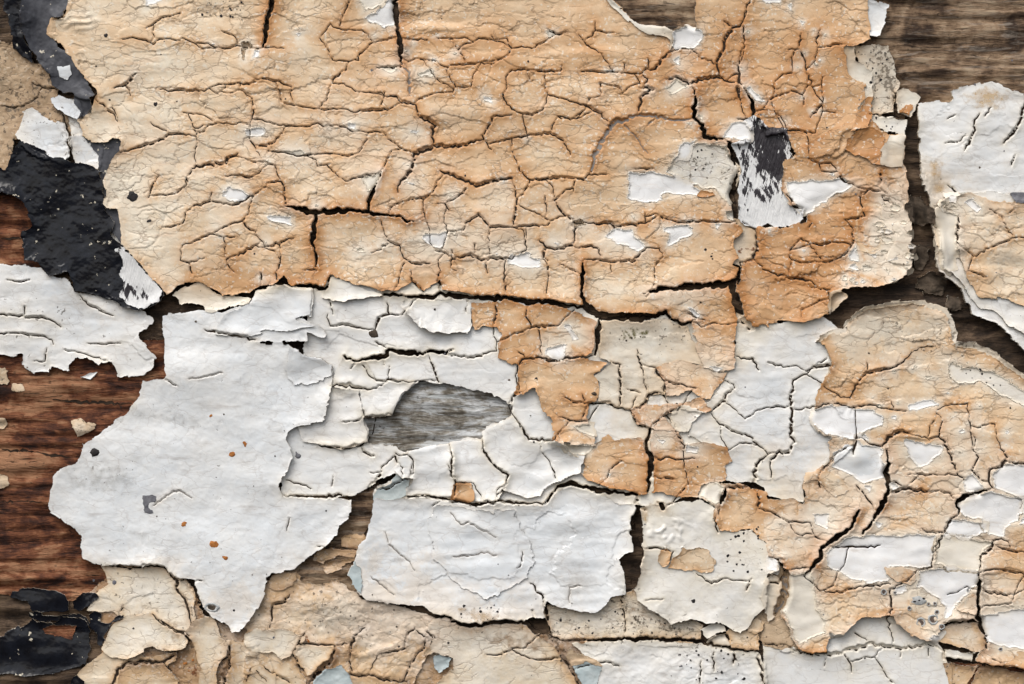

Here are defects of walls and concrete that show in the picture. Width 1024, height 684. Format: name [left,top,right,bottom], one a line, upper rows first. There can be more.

crack [100,74,135,122]
crack [869,92,907,119]
peeling [844,0,1024,165]
crack [62,114,73,157]
peeling [870,203,918,283]
peeling [933,192,982,276]
crack [120,0,890,584]
crack [0,307,121,366]
crack [435,346,1024,684]
peeling [43,625,76,640]
crack [292,628,435,683]